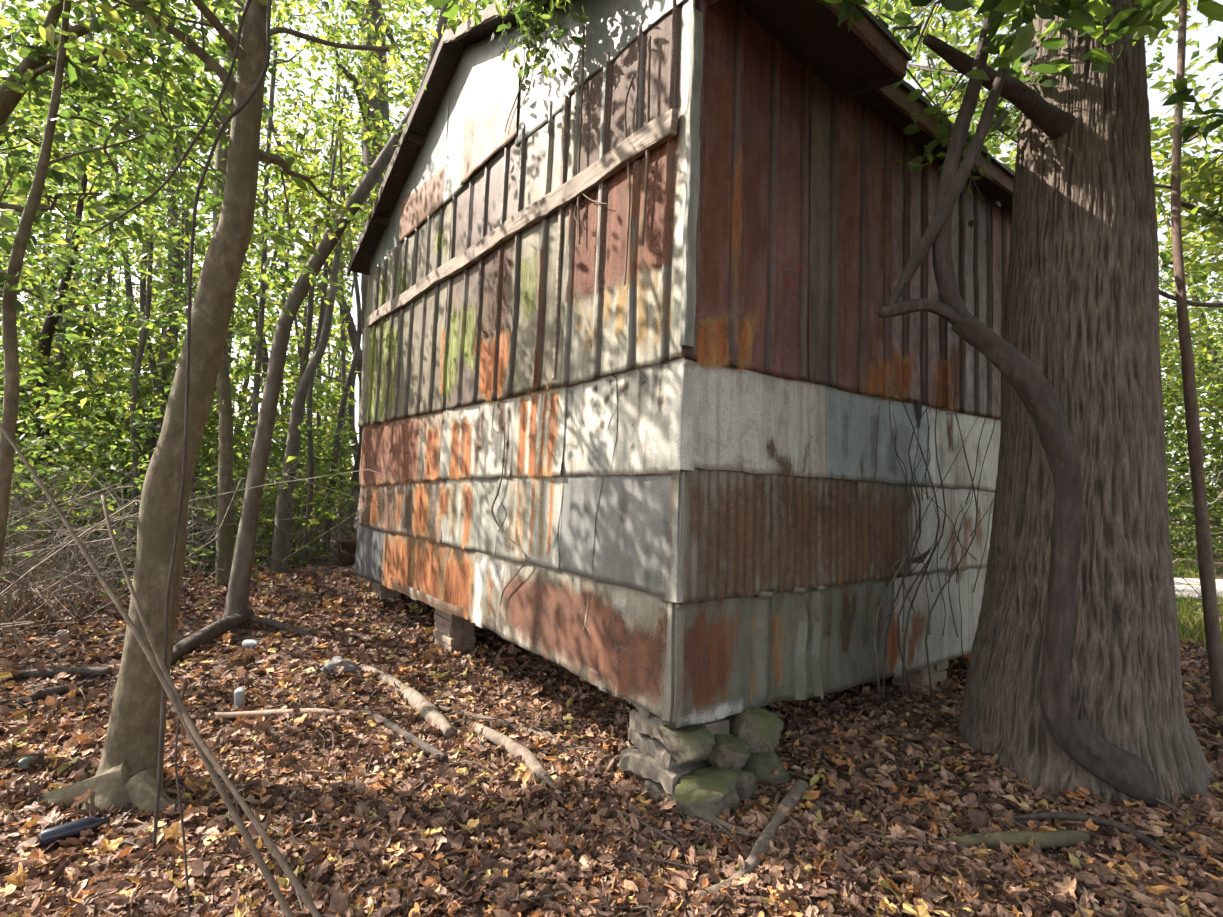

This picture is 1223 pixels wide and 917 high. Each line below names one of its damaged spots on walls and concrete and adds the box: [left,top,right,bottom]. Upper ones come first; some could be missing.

corrosion [361,417,486,623]
corrosion [474,239,559,558]
corrosion [767,440,791,474]
corrosion [489,571,667,702]
corrosion [684,609,734,710]